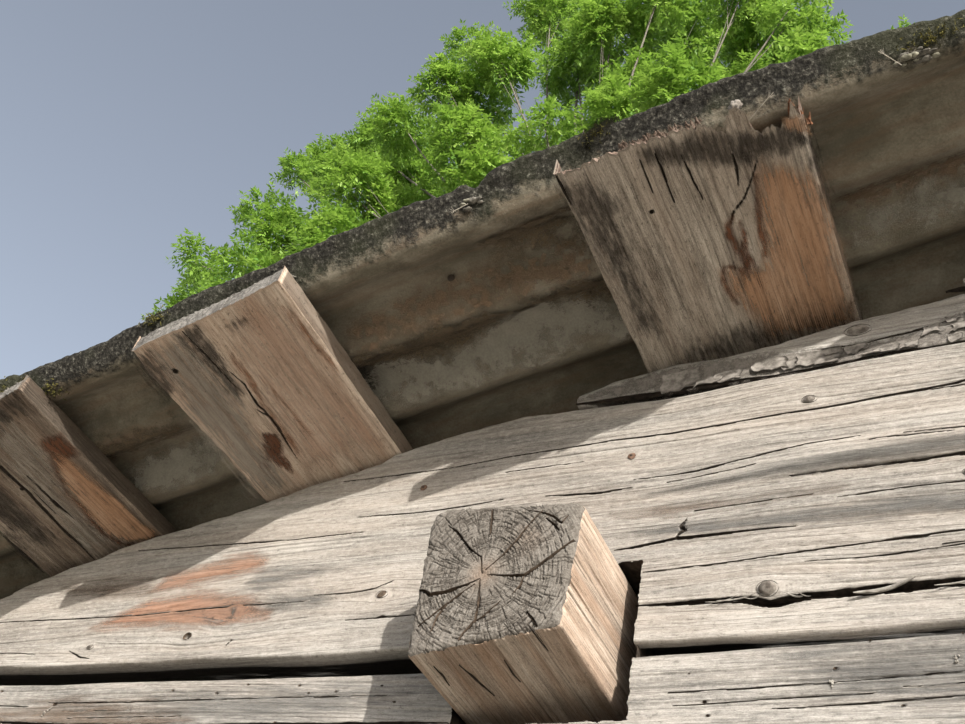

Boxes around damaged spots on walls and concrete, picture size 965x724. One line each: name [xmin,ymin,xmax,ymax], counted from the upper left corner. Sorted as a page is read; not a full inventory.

crack [731,151,756,222]
water stain [841,153,965,235]
water stain [637,117,862,362]
crack [182,331,296,457]
crack [343,379,965,482]
crack [576,321,965,405]
crack [0,426,965,641]
crack [527,612,549,652]
crack [0,695,387,724]
crack [227,716,449,724]
crack [433,664,495,696]